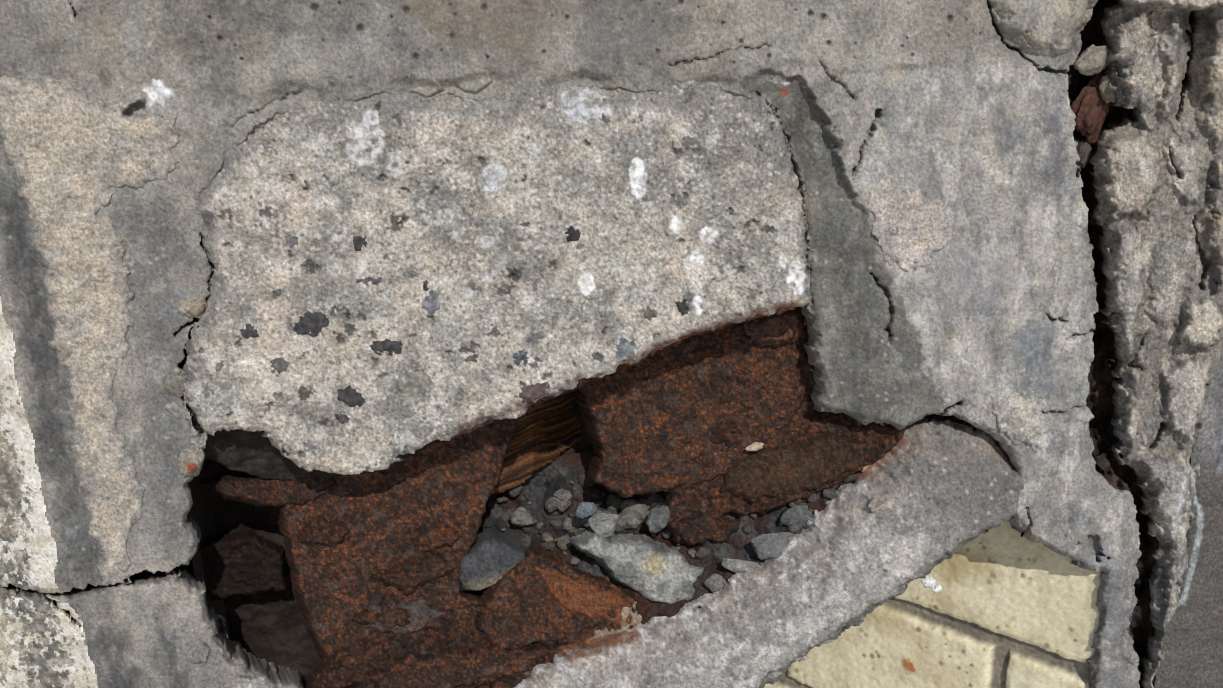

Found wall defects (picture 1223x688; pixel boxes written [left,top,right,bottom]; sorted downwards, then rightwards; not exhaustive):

crack [1045,0,1159,688]
peeling [296,511,350,548]
peeling [667,513,741,547]
spalling [1076,535,1109,561]
crack [129,565,185,581]
crack [9,583,98,613]
peeling [367,558,443,635]
rust [534,566,638,661]
spalling [218,659,304,688]
peeling [362,644,559,688]